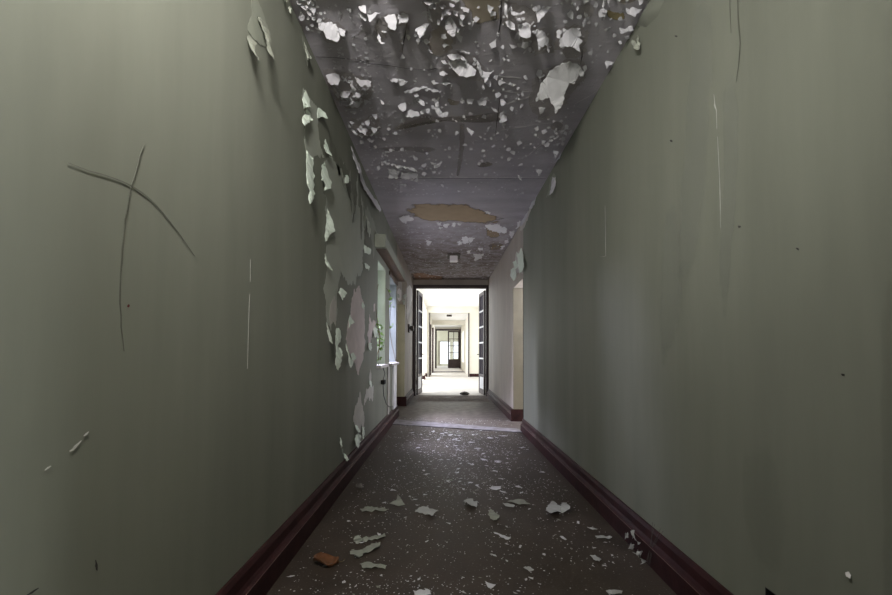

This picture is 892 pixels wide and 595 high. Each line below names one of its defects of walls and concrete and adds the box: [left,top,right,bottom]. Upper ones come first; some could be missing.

peeling [316,18,347,44]
peeling [358,0,493,118]
peeling [502,0,589,120]
peeling [618,0,643,50]
peeling [322,69,384,138]
peeling [466,98,508,123]
crack [69,146,194,349]
peeling [302,89,381,448]
leakage [407,204,499,237]
peeling [457,236,484,261]
peeling [510,248,524,281]
peeling [485,151,561,249]